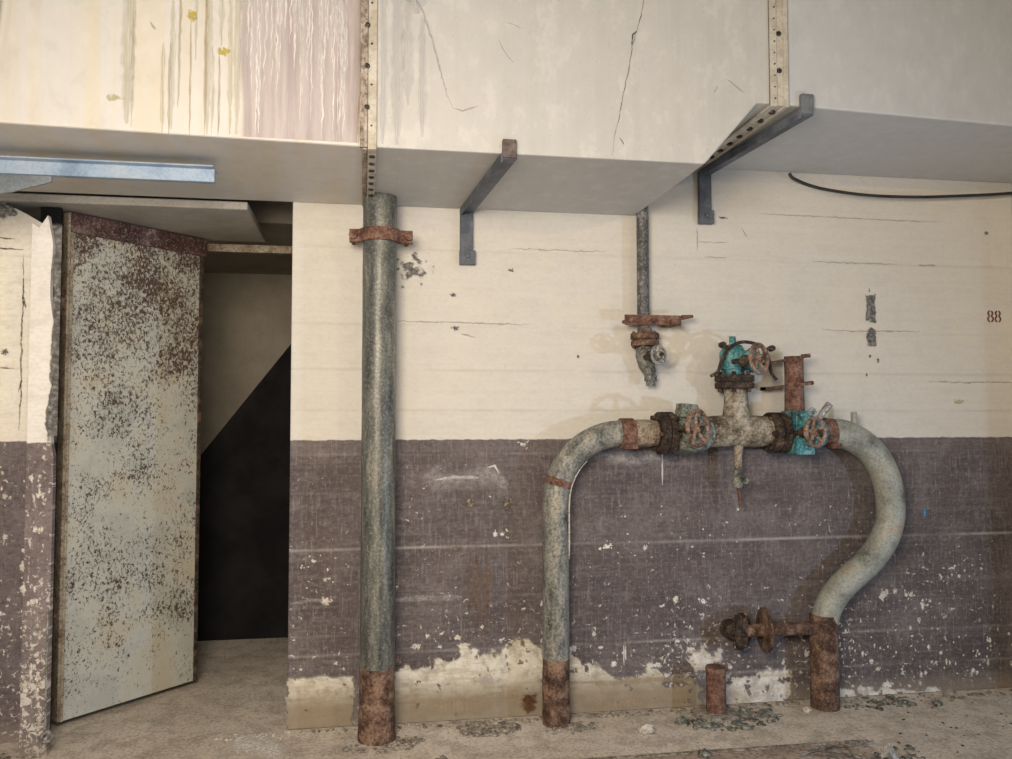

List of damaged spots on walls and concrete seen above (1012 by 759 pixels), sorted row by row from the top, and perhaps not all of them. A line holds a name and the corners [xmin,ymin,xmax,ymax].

crack [613,1,644,146]
spalling [397,252,426,288]
peeling [394,635,543,723]
peeling [569,641,791,713]